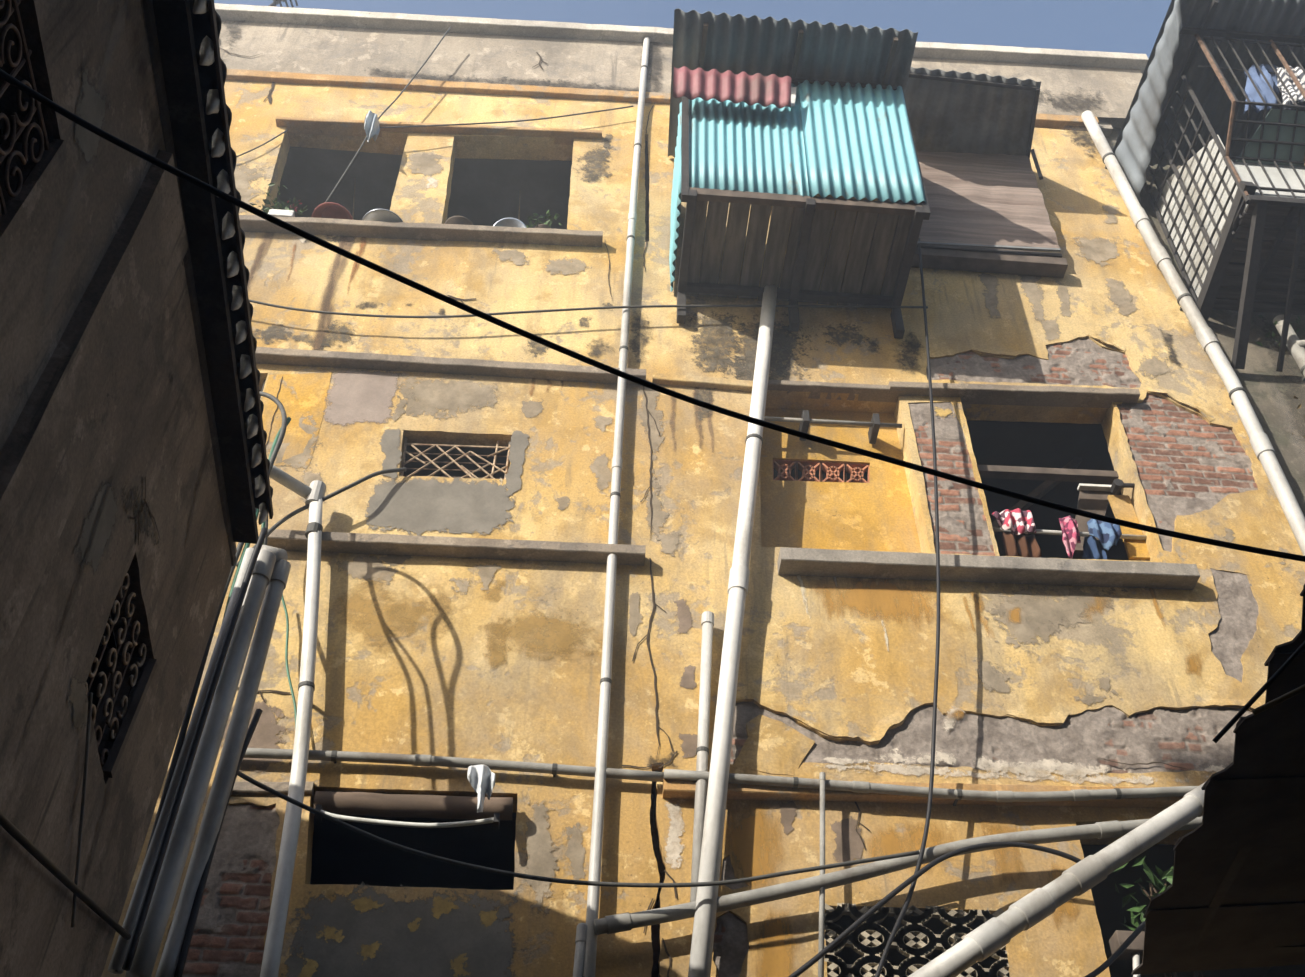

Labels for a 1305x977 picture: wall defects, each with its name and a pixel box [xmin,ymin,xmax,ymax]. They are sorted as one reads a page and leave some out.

damp [248,232,274,283]
damp [253,235,355,350]
peeling [1073,204,1140,316]
damp [686,312,878,444]
damp [898,332,924,373]
flaking render [926,273,1258,552]
crack [622,386,677,977]
flaking render [730,660,1259,786]
peeling [984,586,1127,653]
flaking render [1208,568,1259,683]
flaking render [182,804,280,977]